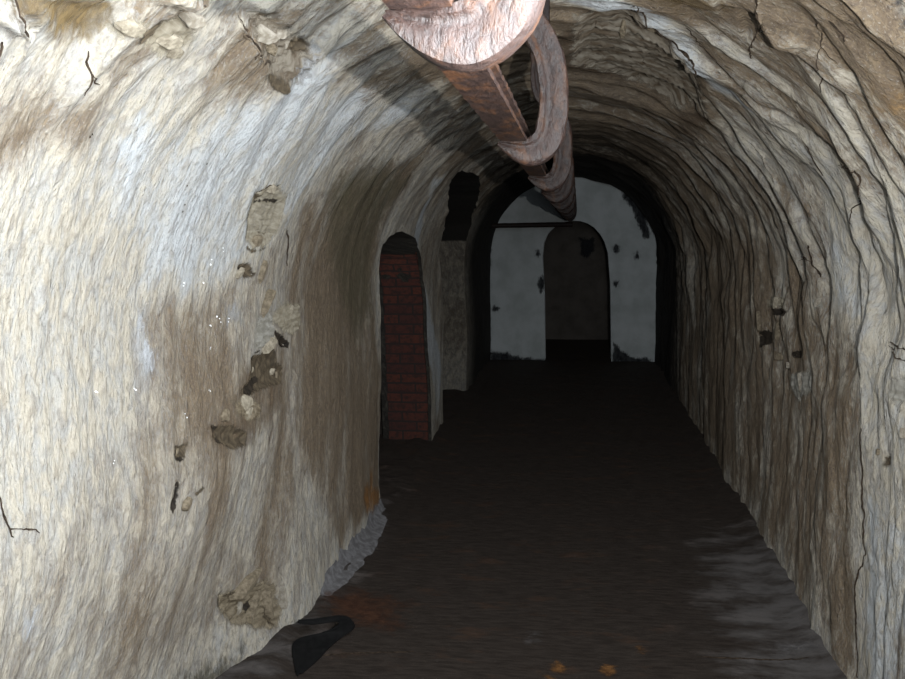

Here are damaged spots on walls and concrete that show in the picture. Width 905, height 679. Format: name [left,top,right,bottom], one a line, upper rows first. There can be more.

crack [0,0,31,57]
crack [633,6,731,80]
crack [749,0,763,59]
crack [84,51,100,96]
crack [806,146,861,224]
crack [799,245,822,277]
spalling [211,184,301,449]
leakage [143,341,152,370]
crack [888,342,905,361]
crack [0,497,40,537]
crack [854,428,866,678]
spalling [217,567,288,629]